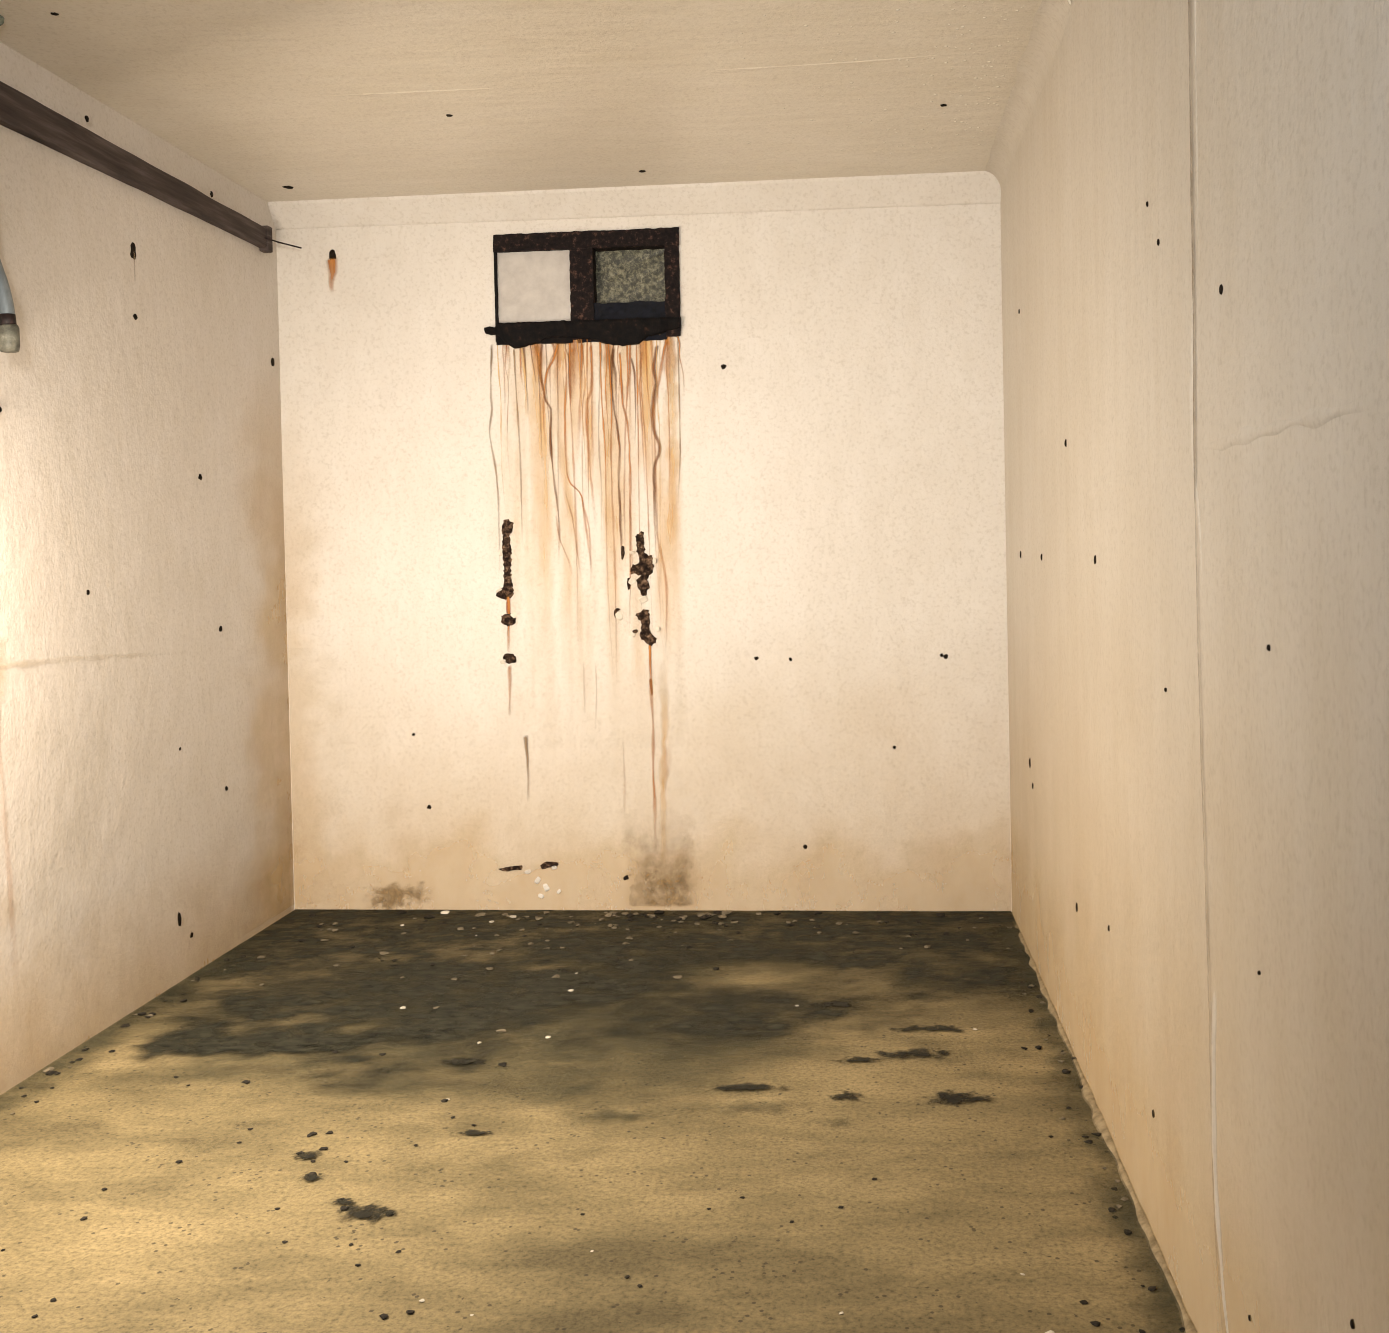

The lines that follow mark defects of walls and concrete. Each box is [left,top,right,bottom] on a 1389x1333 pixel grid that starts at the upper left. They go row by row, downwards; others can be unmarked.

corrosion [328,249,336,283]
crack [1188,0,1203,585]
corrosion [490,336,682,536]
water stain [0,871,1082,1107]
water stain [294,1151,322,1181]
water stain [1110,1192,1183,1333]
crack [1212,981,1230,1333]